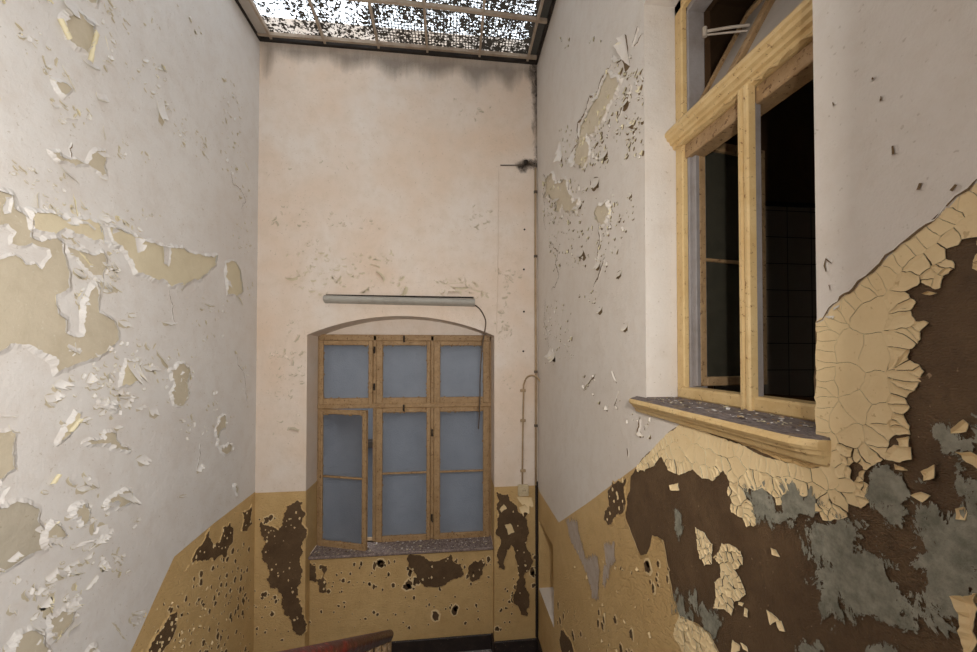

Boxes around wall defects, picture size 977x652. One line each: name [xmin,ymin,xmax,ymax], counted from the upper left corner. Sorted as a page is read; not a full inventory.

peeling [15,22,92,128]
peeling [47,0,252,207]
peeling [542,54,644,229]
crack [891,144,899,156]
peeling [0,126,254,467]
peeling [285,239,408,297]
crack [816,177,977,323]
peeling [602,183,977,652]
peeling [112,491,535,652]
peeling [557,597,638,652]